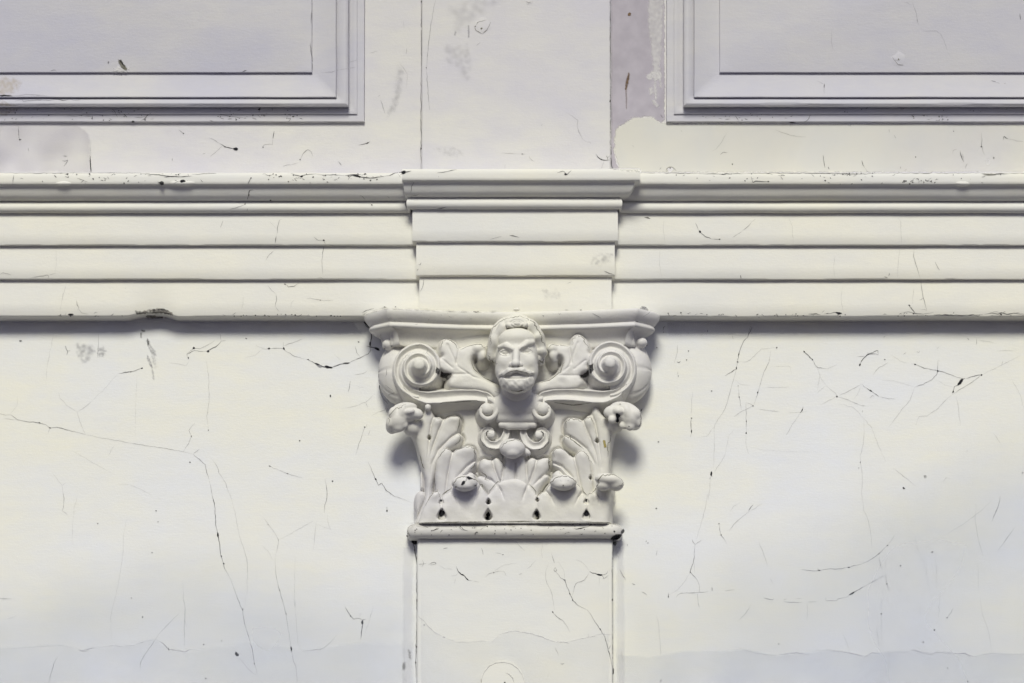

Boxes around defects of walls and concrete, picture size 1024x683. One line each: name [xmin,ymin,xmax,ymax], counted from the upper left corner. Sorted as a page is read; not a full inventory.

peeling [609,0,665,168]
crack [268,324,379,391]